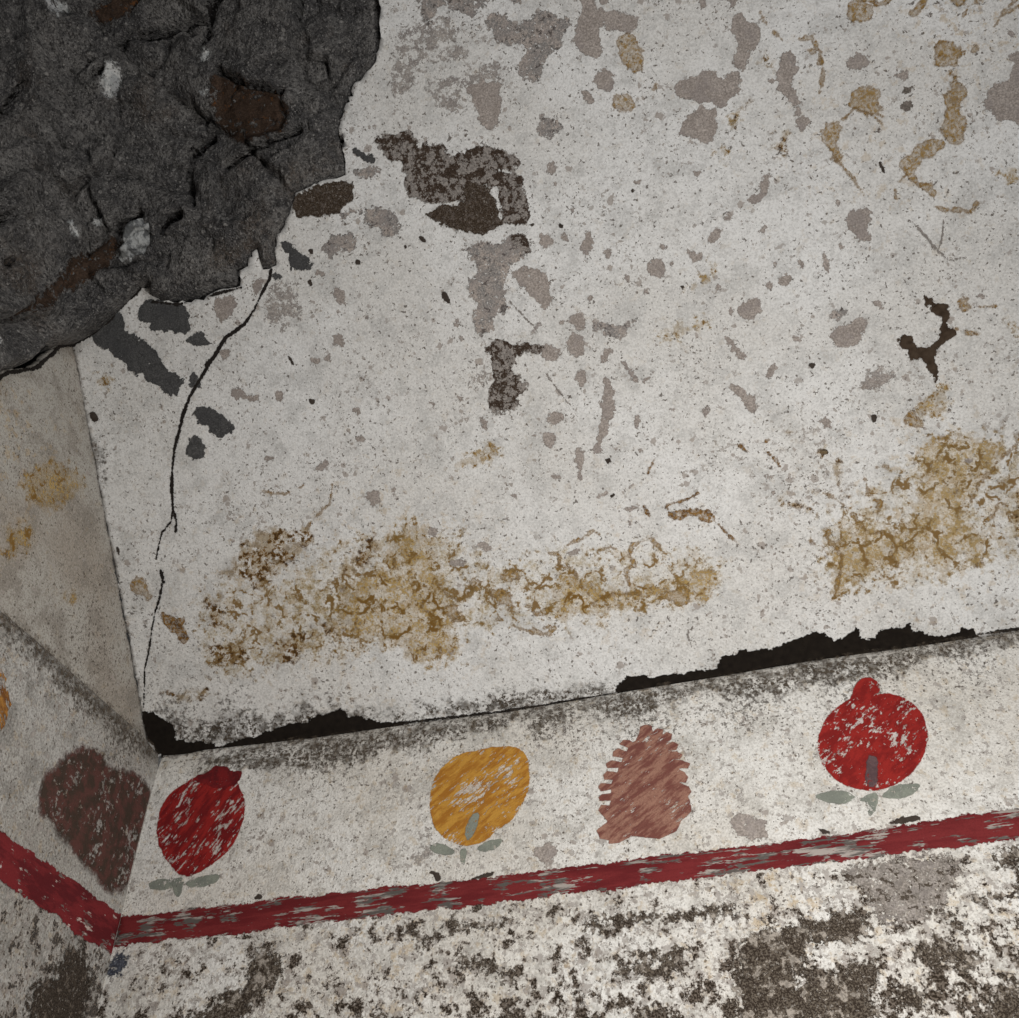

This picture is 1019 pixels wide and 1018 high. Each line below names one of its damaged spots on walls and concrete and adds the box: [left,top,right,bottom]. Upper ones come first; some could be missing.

peeling [674,0,761,144]
spalling [0,0,655,430]
crack [0,288,186,381]
spalling [897,295,957,383]
peeling [186,406,235,461]
crack [143,268,273,708]
damp [817,437,1019,594]
damp [280,532,402,662]
damp [432,528,625,634]
damp [625,547,702,613]
spalling [616,623,979,693]
spalling [142,708,404,757]